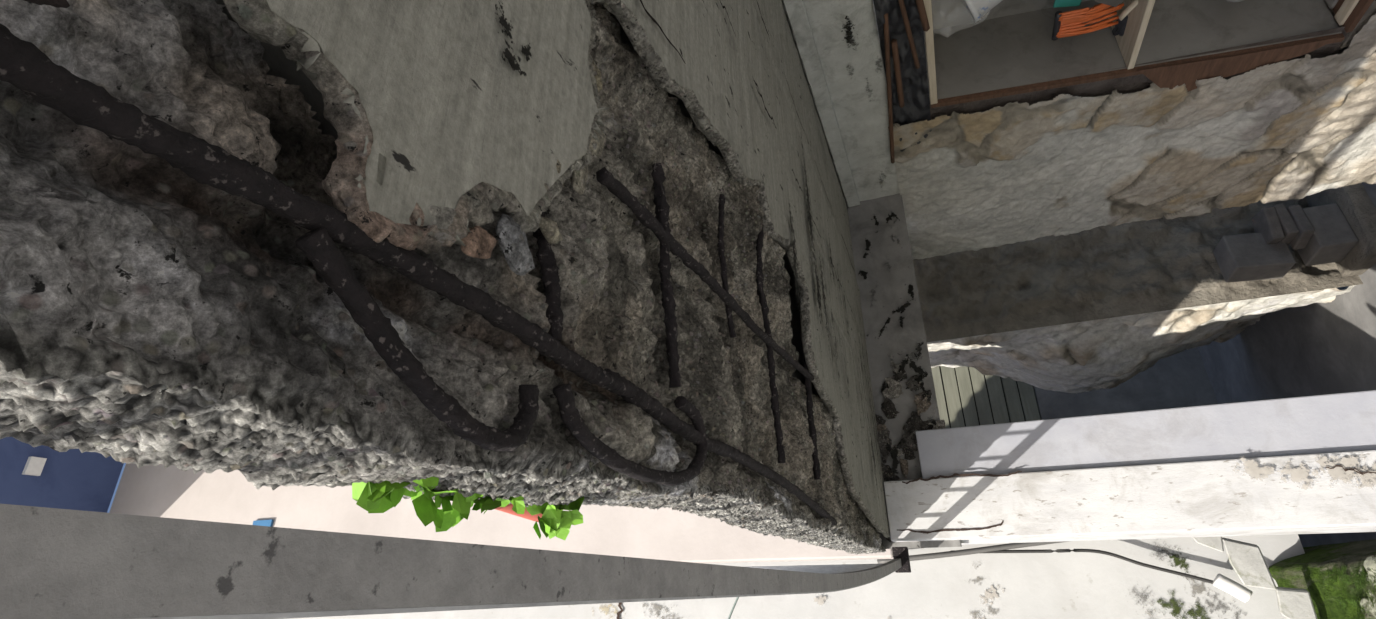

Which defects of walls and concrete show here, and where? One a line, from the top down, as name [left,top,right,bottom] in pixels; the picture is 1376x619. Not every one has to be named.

spalling [0,0,891,555]
spalling [875,360,945,481]
peeling [1233,455,1376,489]
water stain [1133,546,1246,619]